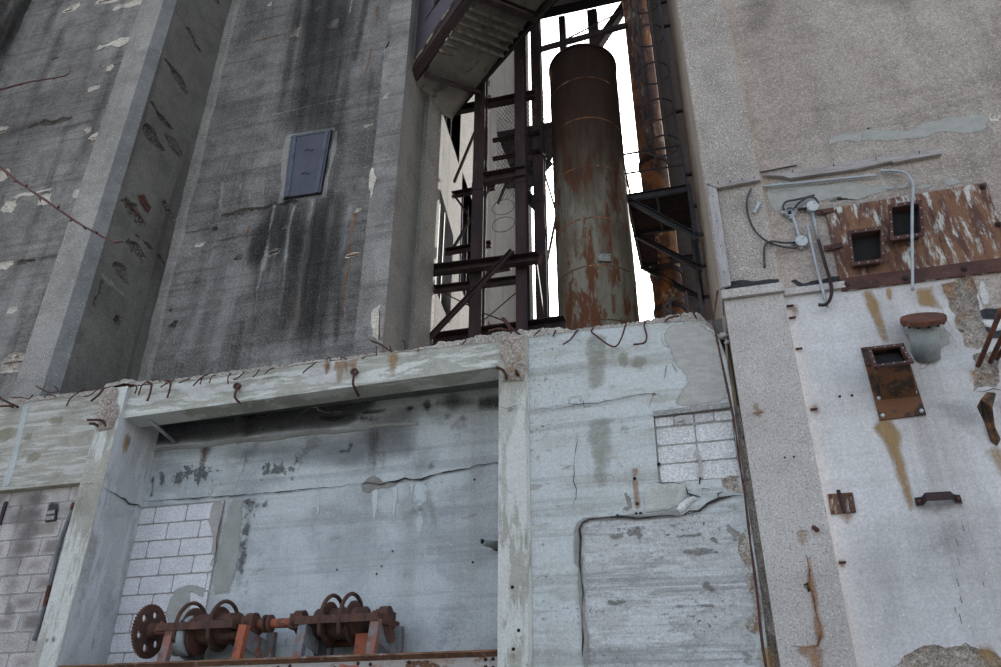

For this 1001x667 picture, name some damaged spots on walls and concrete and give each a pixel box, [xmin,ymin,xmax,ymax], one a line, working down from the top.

spalling [1,188,52,213]
spalling [120,194,175,266]
water stain [249,0,366,342]
rust [865,291,886,339]
spalling [941,276,1001,390]
water stain [151,464,221,496]
water stain [260,457,299,480]
crack [78,454,510,560]
spalling [0,290,767,667]
crack [499,335,742,657]
rust [875,420,912,506]
spalling [898,643,1001,667]